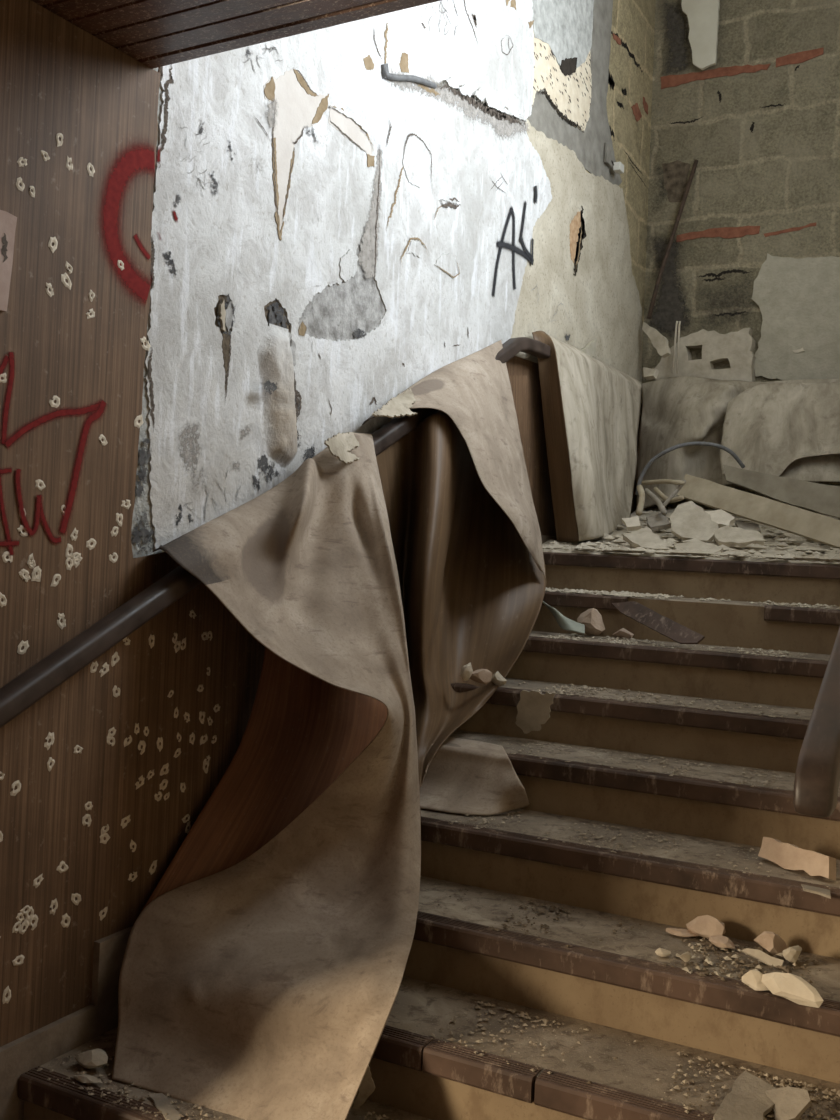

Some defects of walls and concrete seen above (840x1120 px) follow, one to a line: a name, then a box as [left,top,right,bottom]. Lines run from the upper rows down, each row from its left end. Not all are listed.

spalling [528,20,592,132]
spalling [660,47,824,89]
peeling [254,23,409,436]
spalling [569,206,587,276]
spalling [676,223,816,242]
peeling [214,295,235,401]
spalling [654,328,756,382]